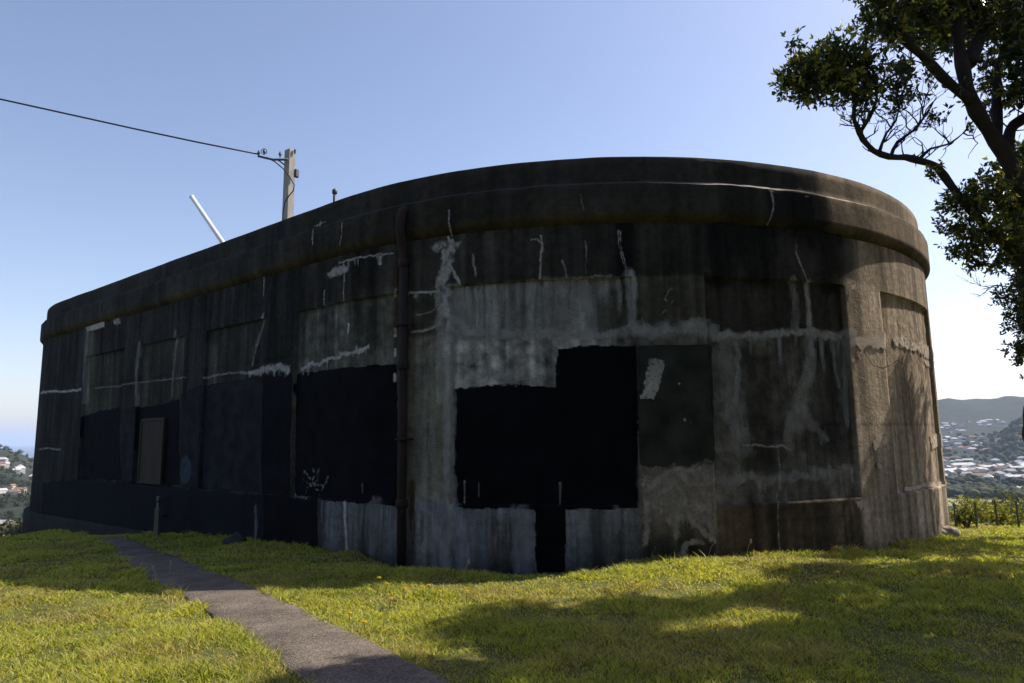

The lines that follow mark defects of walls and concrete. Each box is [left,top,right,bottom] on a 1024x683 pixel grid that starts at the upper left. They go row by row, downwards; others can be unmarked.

water stain [328,253,394,277]
water stain [241,345,369,375]
water stain [393,236,519,571]
water stain [525,270,857,361]